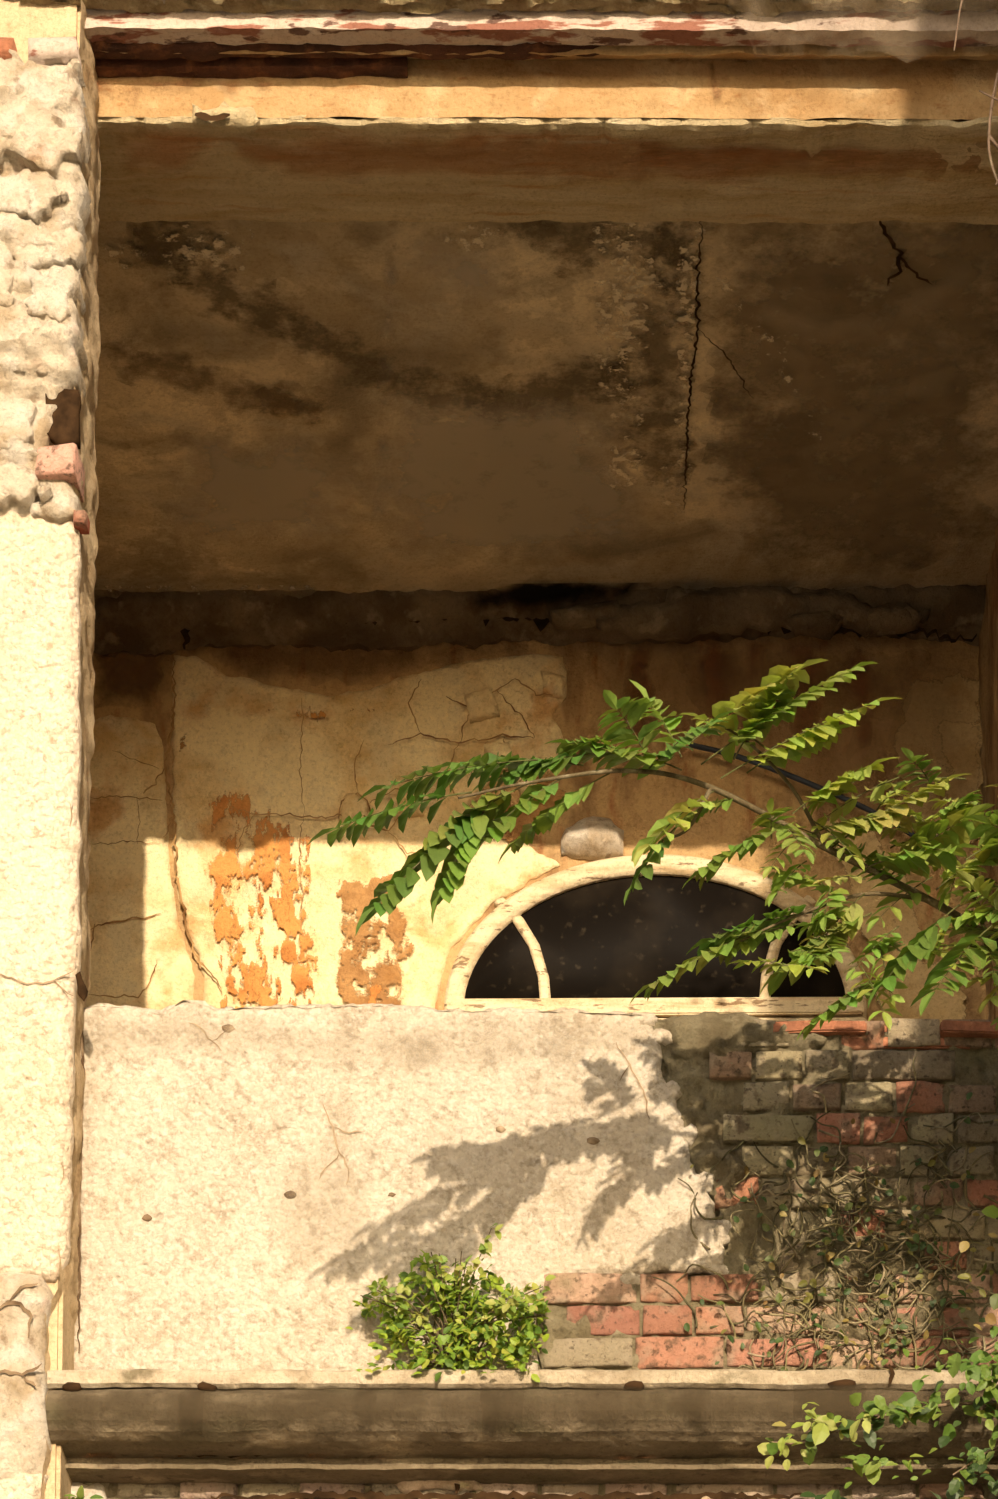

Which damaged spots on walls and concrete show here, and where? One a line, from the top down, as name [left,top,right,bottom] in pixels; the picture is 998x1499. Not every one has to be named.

spalling [192,101,261,134]
spalling [0,37,91,535]
water stain [104,221,742,523]
crack [682,221,752,508]
crack [879,221,933,286]
peeling [94,585,316,599]
crack [483,617,550,632]
crack [0,628,222,998]
peeling [204,792,318,1033]
peeling [336,874,414,1005]
crack [231,679,552,942]
spalling [536,959,998,1391]